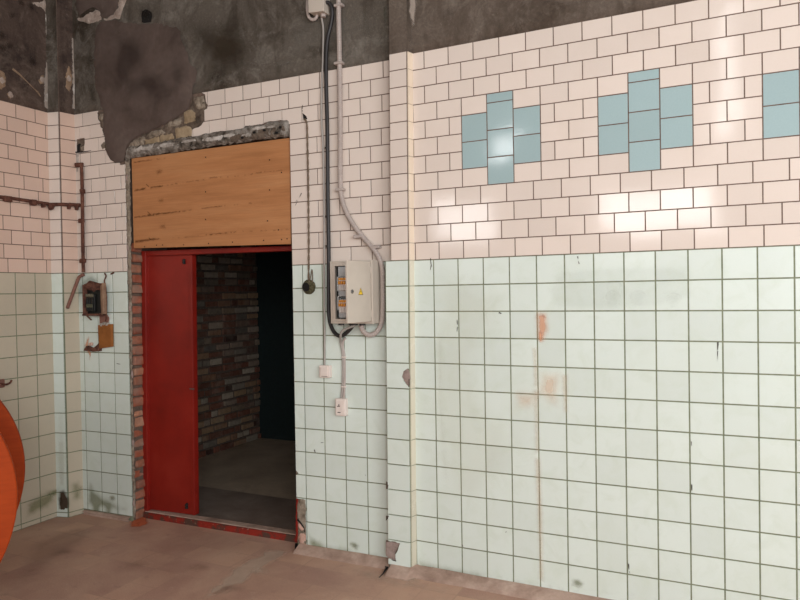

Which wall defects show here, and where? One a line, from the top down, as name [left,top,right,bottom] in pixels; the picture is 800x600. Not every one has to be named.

peeling [77,0,126,24]
peeling [0,70,13,98]
flaking render [38,62,48,109]
flaking render [65,38,75,109]
spalling [125,96,285,518]
spalling [296,498,307,544]
spalling [386,540,400,561]